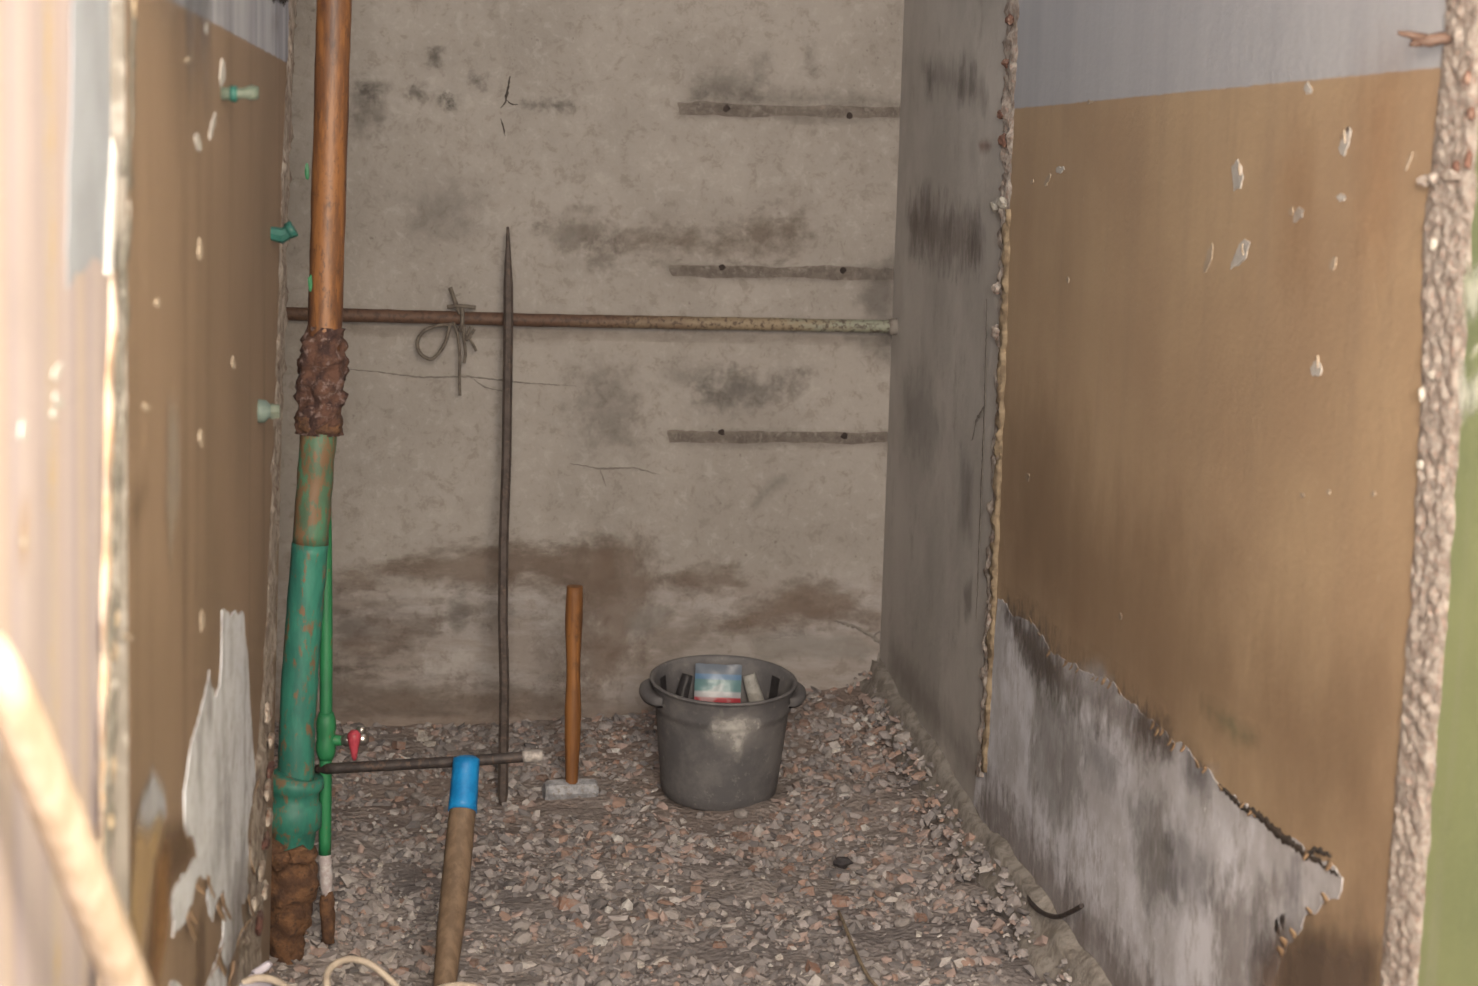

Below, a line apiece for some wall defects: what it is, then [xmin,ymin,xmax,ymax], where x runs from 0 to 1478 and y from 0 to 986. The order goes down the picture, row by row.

peeling [170,0,298,986]
water stain [350,544,653,680]
peeling [973,0,1343,986]
peeling [1338,126,1352,157]